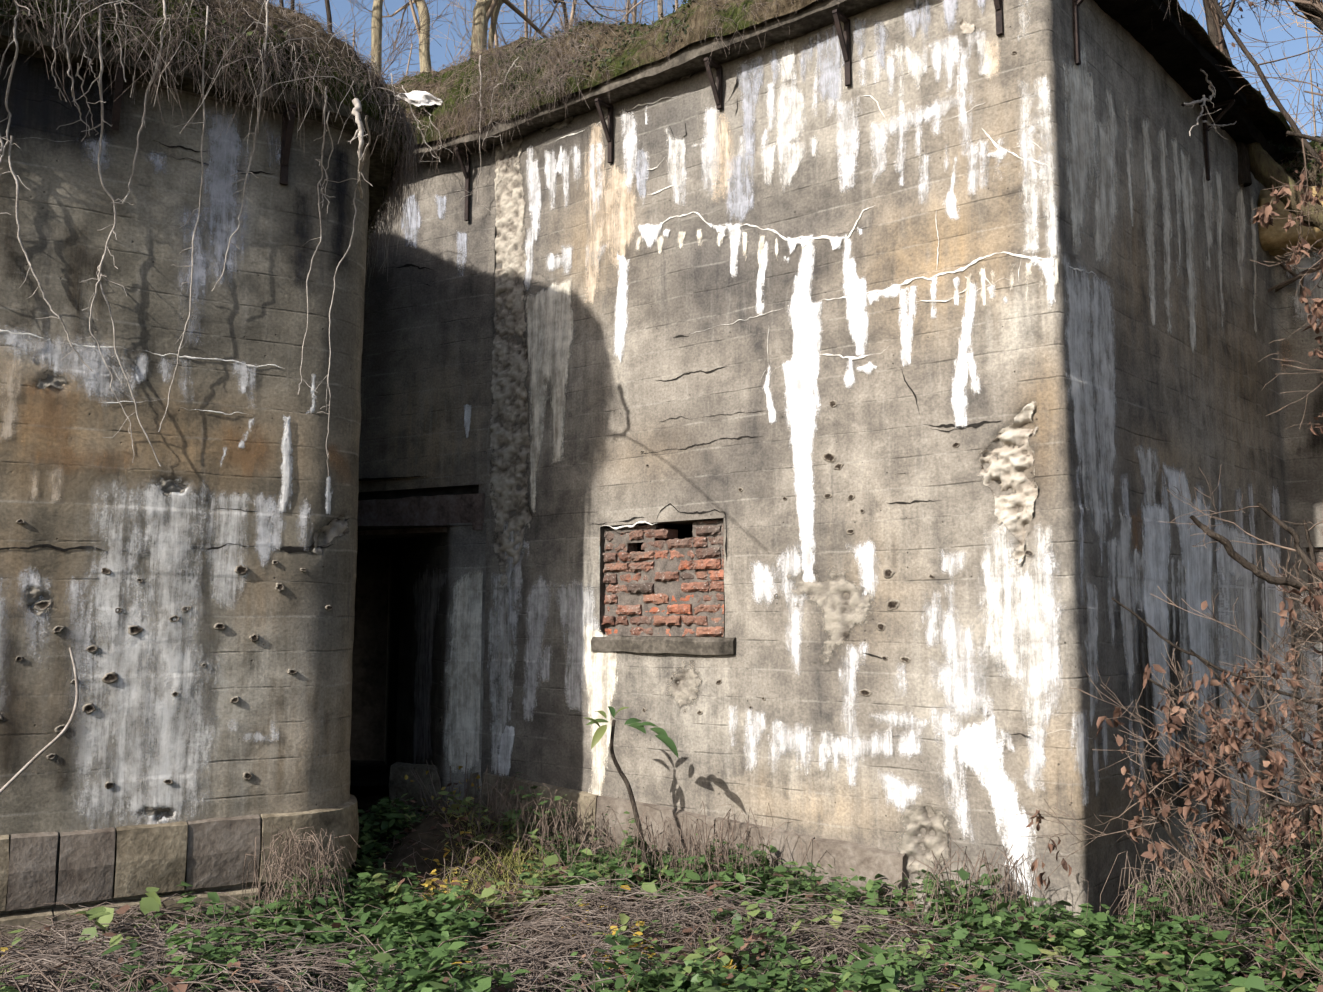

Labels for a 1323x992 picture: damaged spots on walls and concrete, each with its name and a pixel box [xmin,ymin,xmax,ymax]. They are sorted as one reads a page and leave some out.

crack [818,220,1100,318]
rust [1,364,20,438]
damp [60,416,331,825]
crack [190,518,349,553]
spalling [489,136,532,586]
crack [656,366,728,381]
damp [752,239,821,669]
spalling [774,564,900,665]
spalling [979,401,1038,564]
damp [1010,50,1323,859]
damp [729,527,1060,897]
spalling [897,806,952,889]